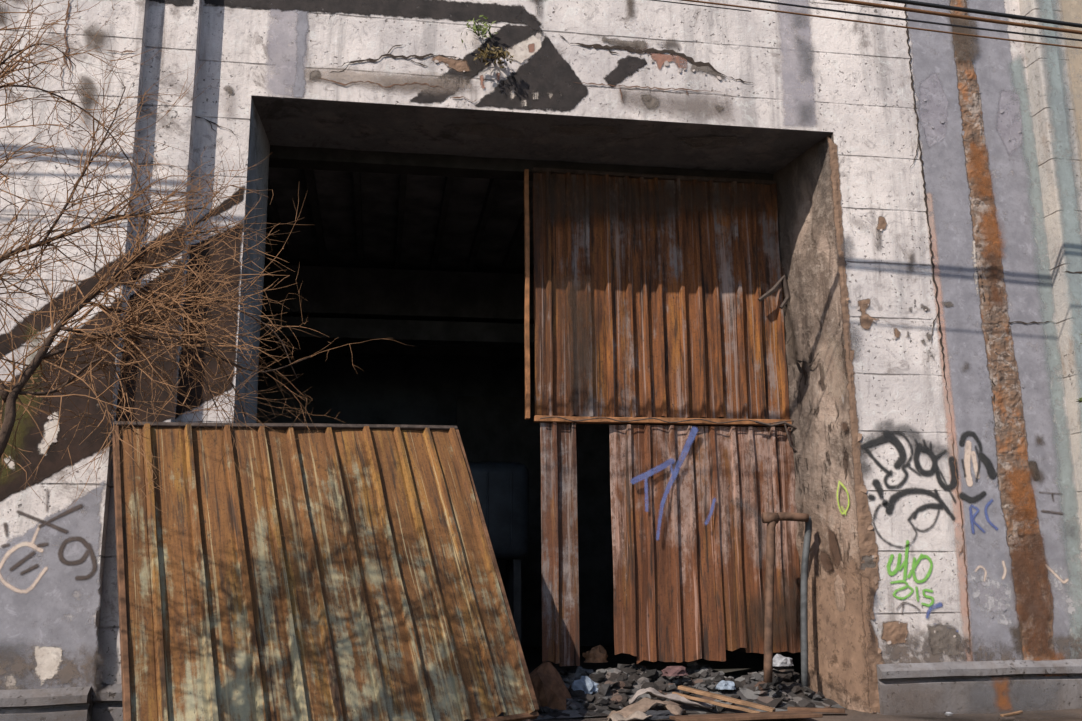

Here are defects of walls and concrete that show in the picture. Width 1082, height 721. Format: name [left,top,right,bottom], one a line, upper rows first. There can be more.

crack [330,44,464,73]
crack [559,34,752,101]
spalling [650,53,725,80]
rust [982,212,1003,306]
crack [904,4,973,661]
rust [1013,537,1061,661]